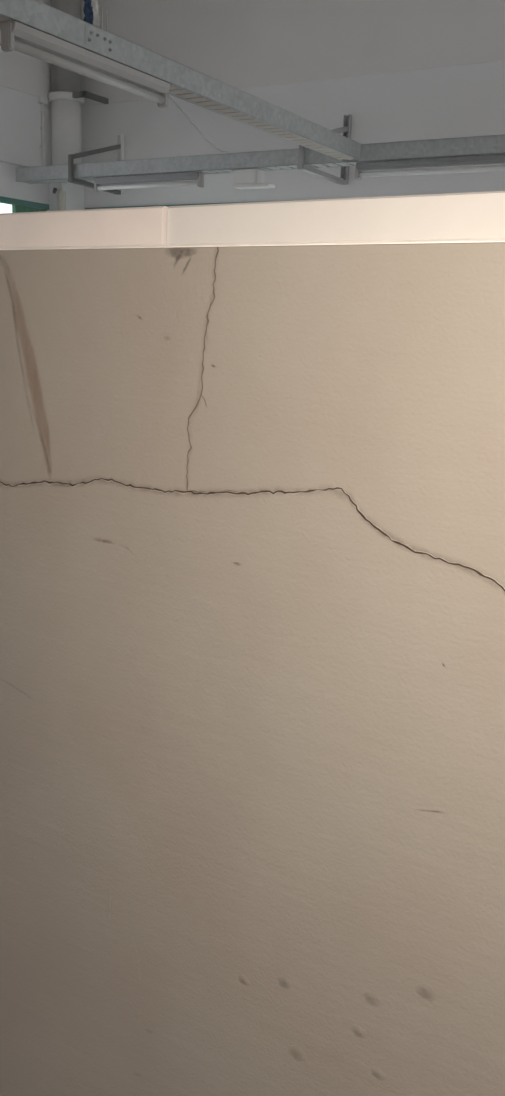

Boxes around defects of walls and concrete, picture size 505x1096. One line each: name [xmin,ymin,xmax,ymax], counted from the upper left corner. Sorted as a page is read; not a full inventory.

crack [0,247,505,592]